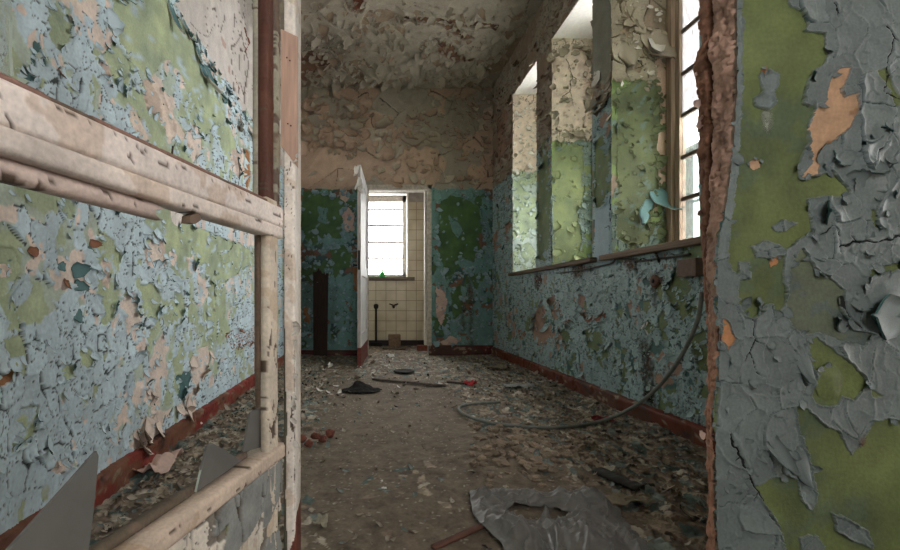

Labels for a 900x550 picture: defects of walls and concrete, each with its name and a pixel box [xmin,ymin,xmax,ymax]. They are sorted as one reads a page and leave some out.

peeling [15,0,82,82]
peeling [90,0,253,188]
peeling [281,0,900,550]
peeling [0,354,28,389]
peeling [12,209,254,474]
crack [745,319,761,376]
crack [730,434,776,524]